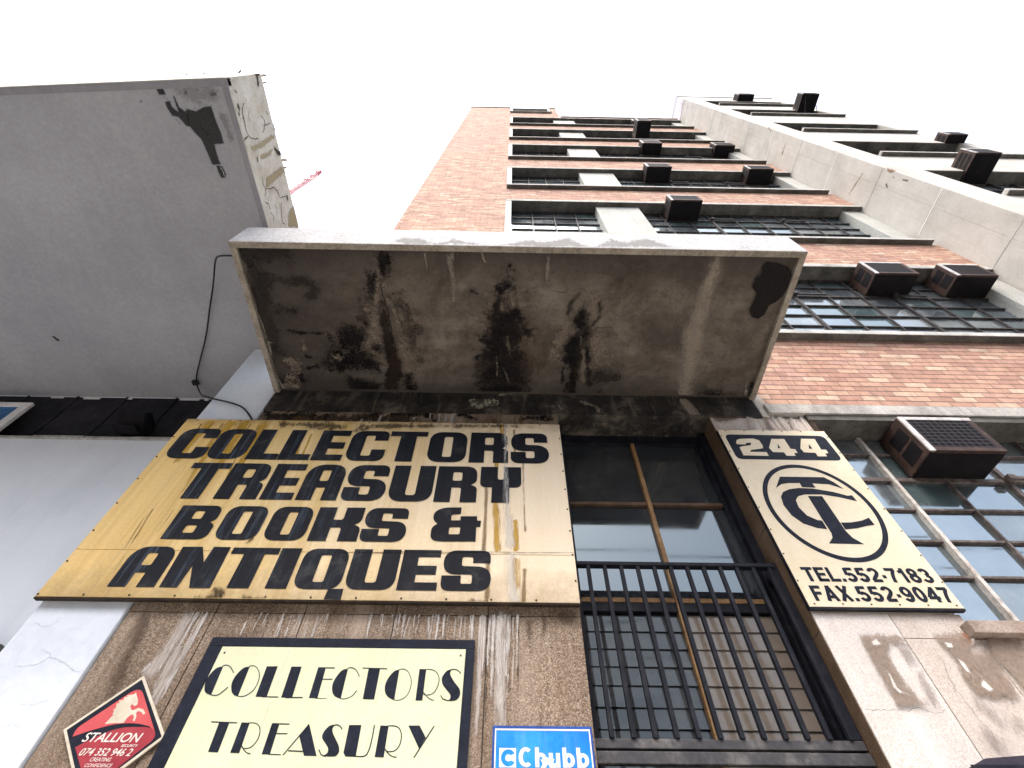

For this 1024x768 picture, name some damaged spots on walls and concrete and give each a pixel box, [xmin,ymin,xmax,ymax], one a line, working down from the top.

peeling [157,72,233,178]
crack [238,103,269,141]
damp [238,248,384,389]
damp [472,264,624,423]
spalling [750,262,792,319]
damp [262,411,477,423]
efflorescence [239,612,329,638]
efflorescence [367,612,519,734]